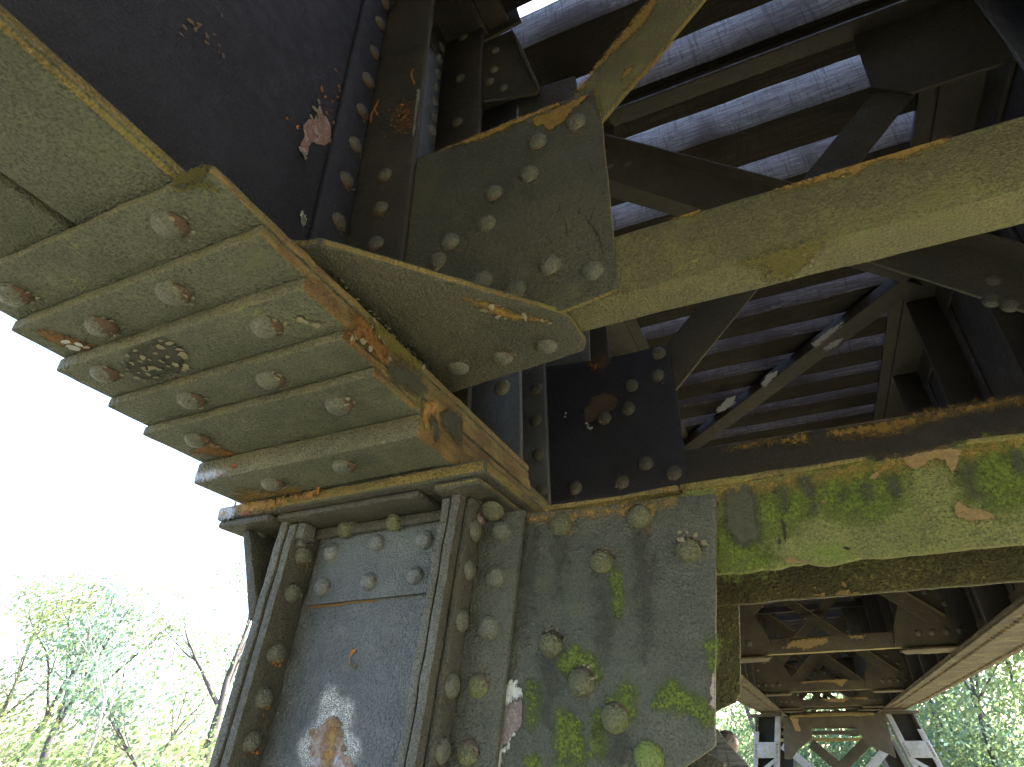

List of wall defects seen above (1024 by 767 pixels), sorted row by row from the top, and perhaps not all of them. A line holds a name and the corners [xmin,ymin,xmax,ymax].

rust [441,0,657,150]
peeling [286,85,341,160]
rust [34,329,97,351]
rust [423,400,439,431]
rust [829,397,1024,437]
rust [728,431,809,451]
peeling [903,448,963,473]
rust [234,487,320,517]
peeling [955,501,995,522]
peeling [309,716,353,767]